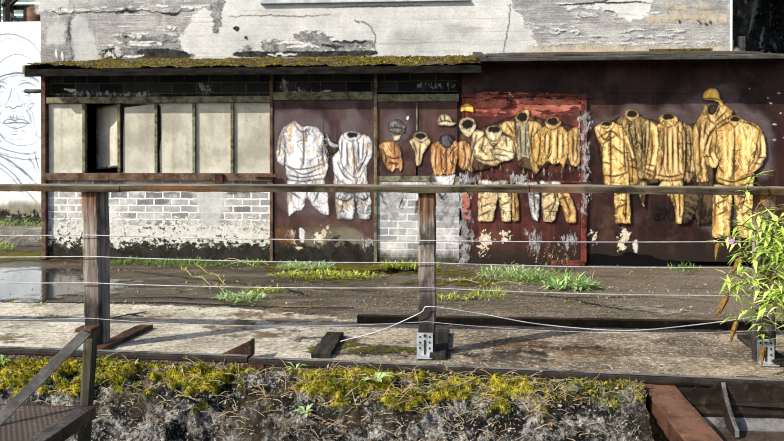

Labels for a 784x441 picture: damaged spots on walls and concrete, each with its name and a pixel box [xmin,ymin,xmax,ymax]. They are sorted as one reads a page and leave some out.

crack [47,4,202,60]
peeling [34,0,688,61]
peeling [471,92,593,182]
peeling [505,173,530,185]
water stain [48,242,83,260]
water stain [110,229,379,262]